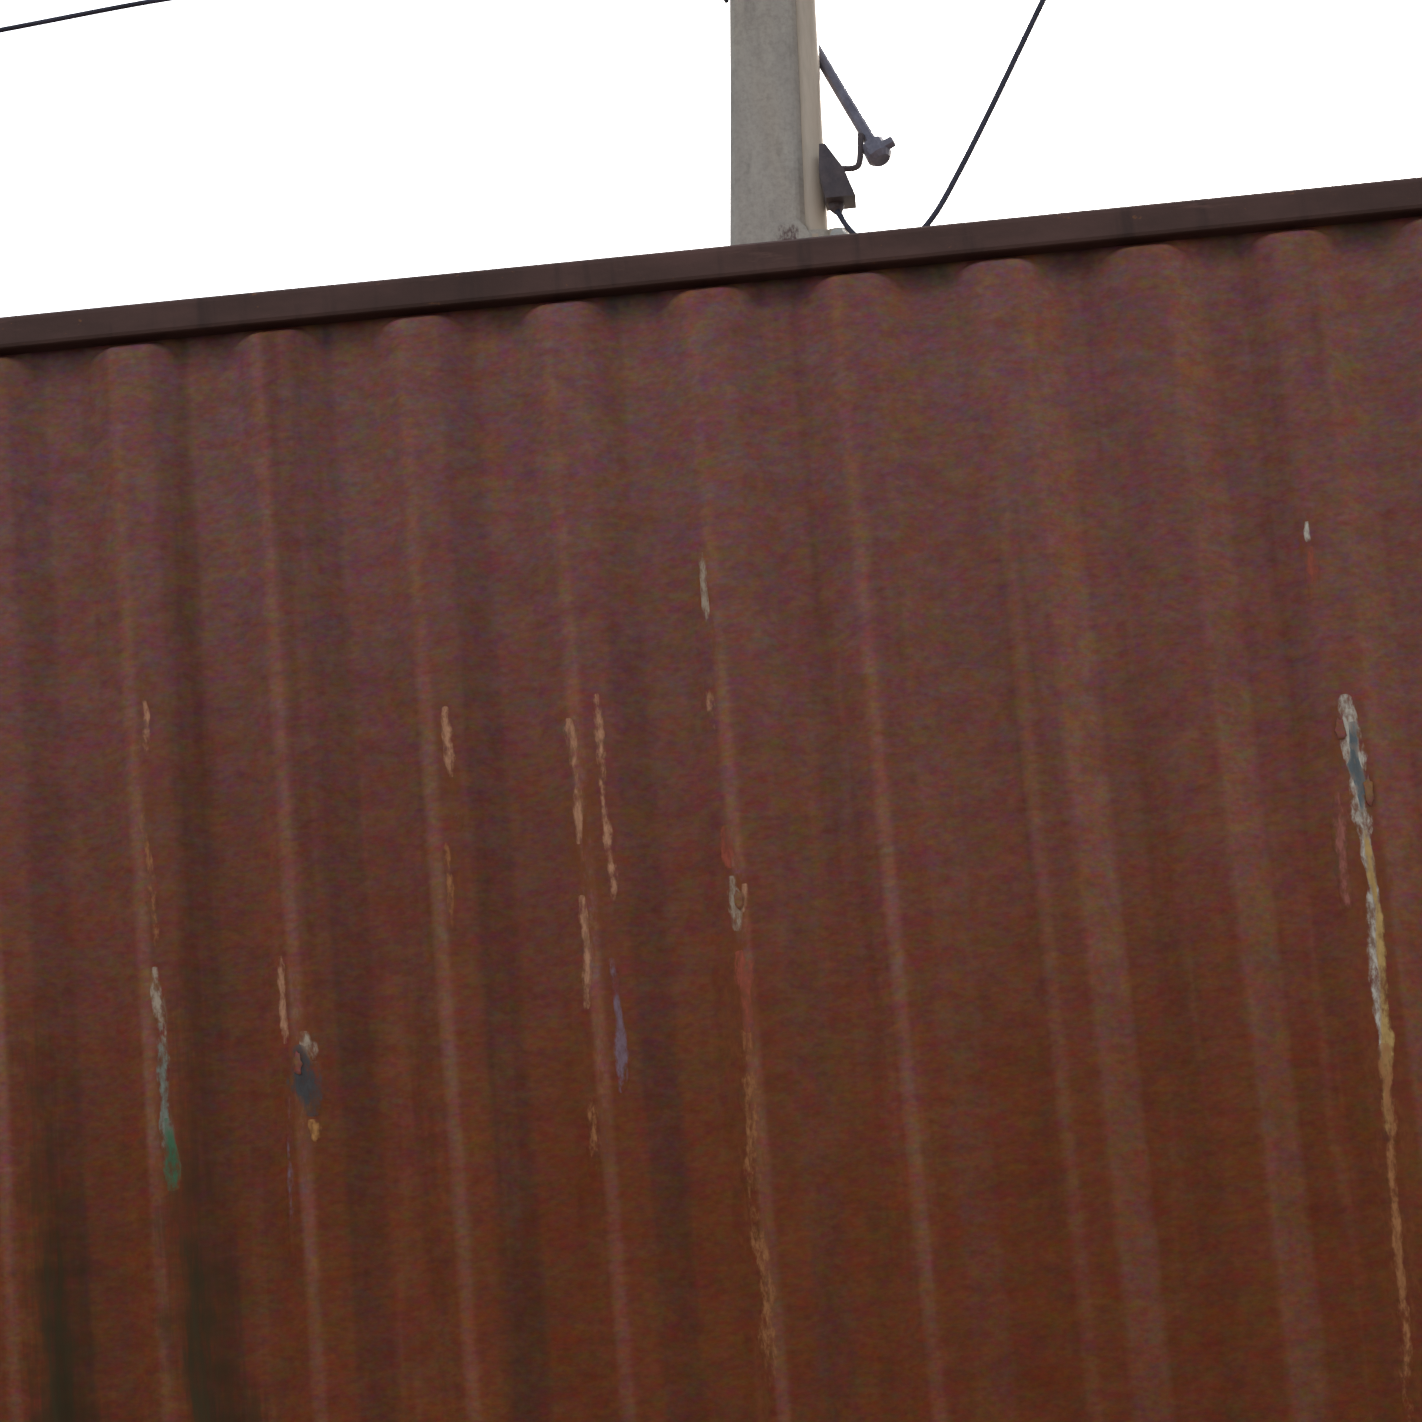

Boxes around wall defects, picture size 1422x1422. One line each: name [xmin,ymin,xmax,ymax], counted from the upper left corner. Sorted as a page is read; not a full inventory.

peeling [256,922,346,1267]
rust [1314,679,1422,1422]